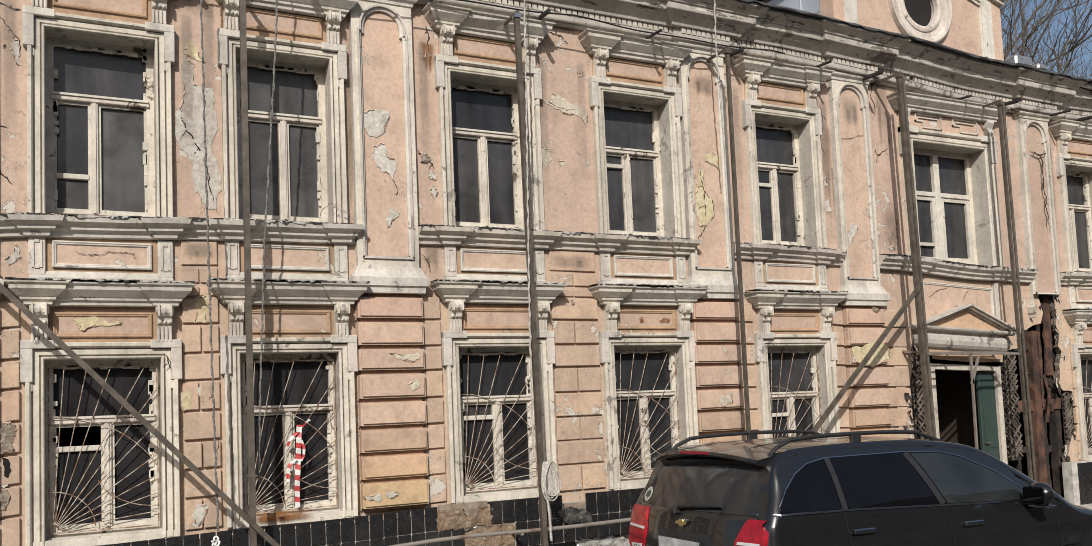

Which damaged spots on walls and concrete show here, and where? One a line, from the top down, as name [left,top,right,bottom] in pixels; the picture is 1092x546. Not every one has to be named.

peeling [174,41,222,210]
peeling [363,109,397,179]
peeling [540,93,588,123]
peeling [695,152,720,227]
peeling [73,317,122,332]
spalling [852,328,921,438]
spalling [0,421,17,511]
spalling [435,506,516,546]